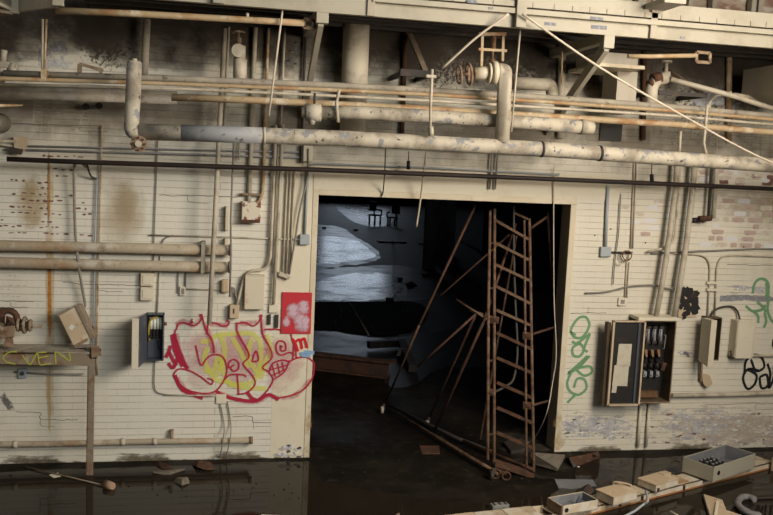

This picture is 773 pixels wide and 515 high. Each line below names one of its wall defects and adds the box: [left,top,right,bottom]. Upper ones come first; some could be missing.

flaking render [697,169,773,248]
peeling [561,412,635,440]
spalling [649,406,773,448]